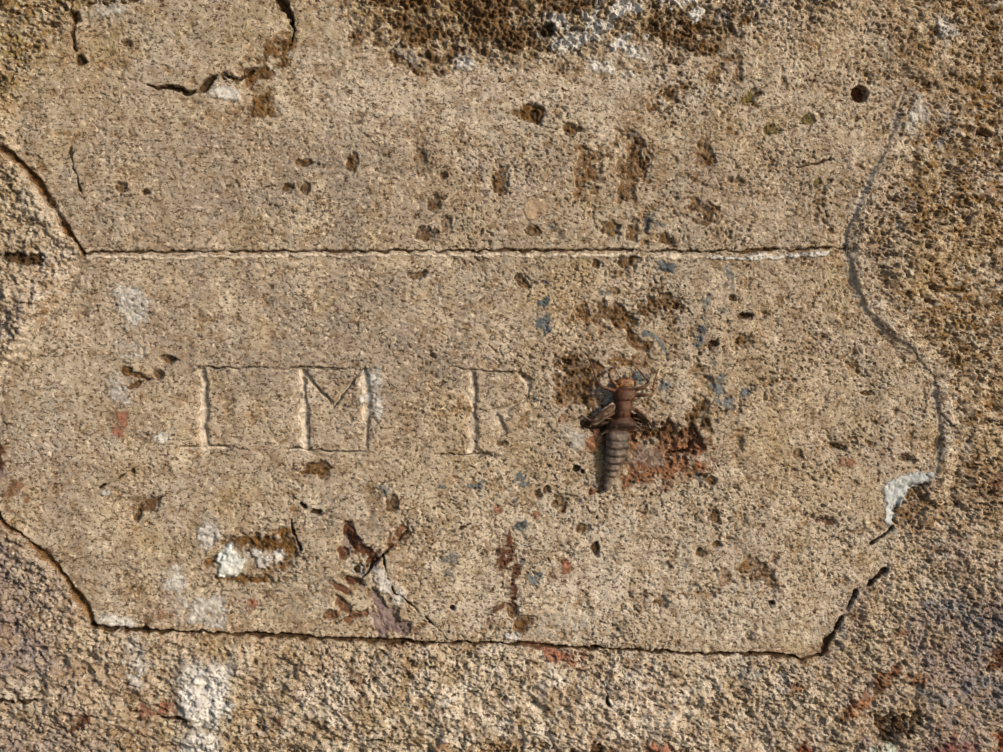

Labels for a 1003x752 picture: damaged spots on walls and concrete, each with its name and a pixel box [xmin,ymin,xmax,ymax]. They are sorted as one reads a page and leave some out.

crack [22,0,137,51]
crack [276,0,296,47]
crack [147,71,255,96]
crack [287,492,321,551]
crack [869,526,892,545]
crack [362,531,447,640]
crack [847,567,887,606]